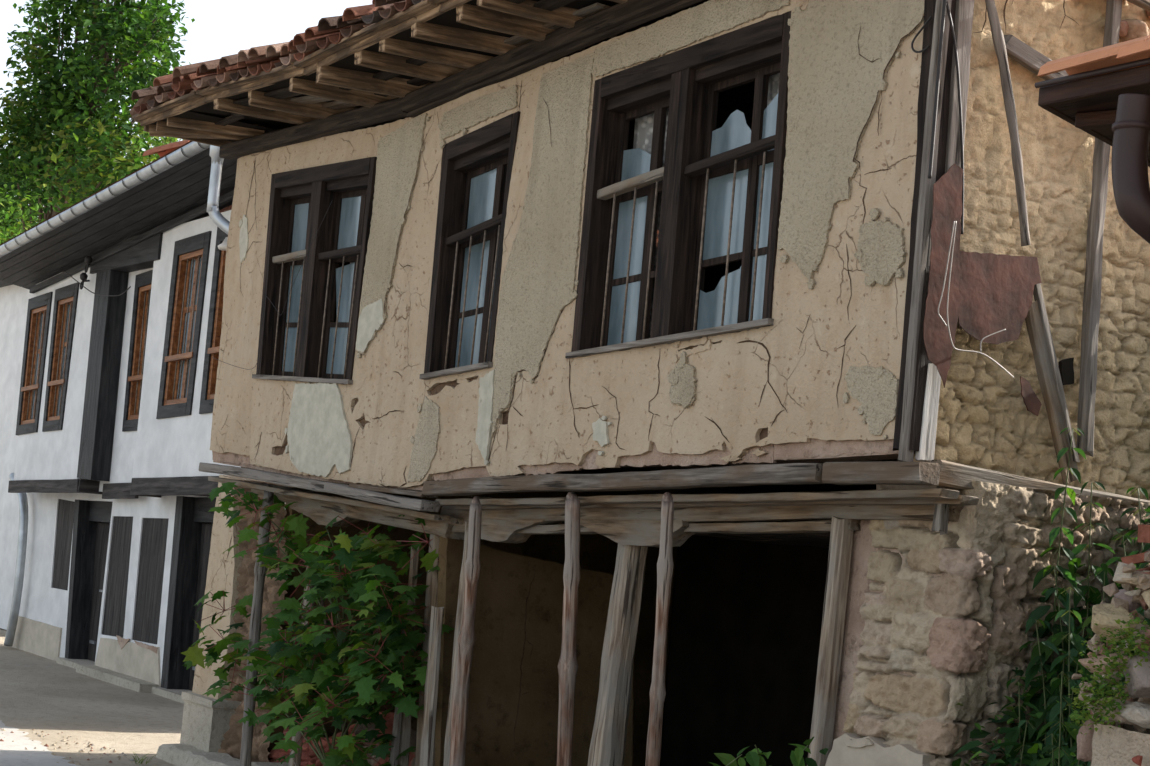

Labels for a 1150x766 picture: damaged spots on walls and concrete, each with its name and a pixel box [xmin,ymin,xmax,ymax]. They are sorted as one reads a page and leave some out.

flaking render [356,113,430,358]
flaking render [407,0,924,482]
crack [836,13,926,404]
flaking render [274,382,370,477]
crack [738,340,787,426]